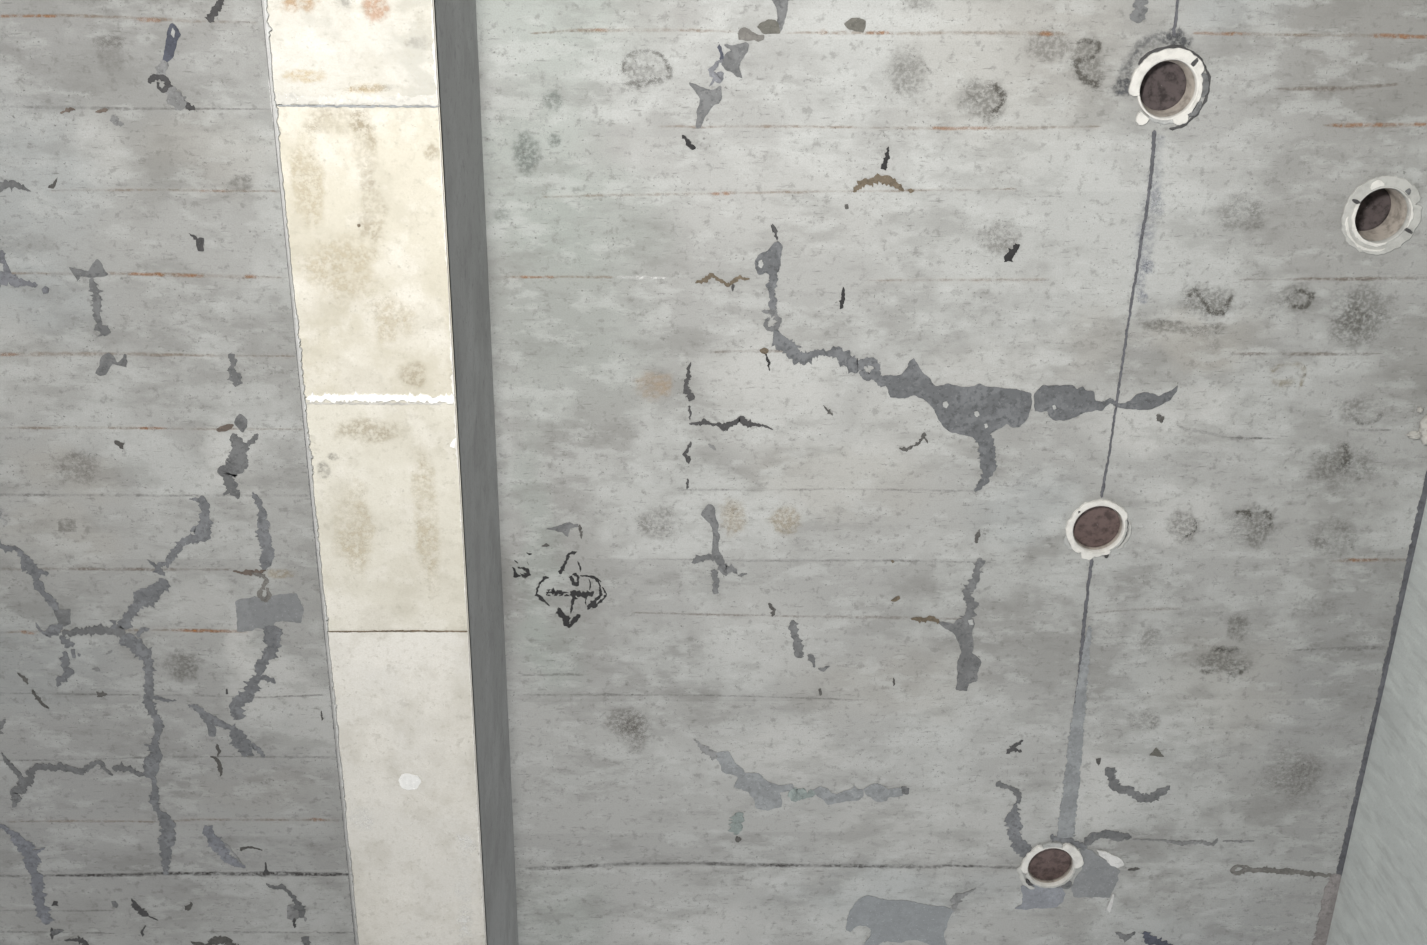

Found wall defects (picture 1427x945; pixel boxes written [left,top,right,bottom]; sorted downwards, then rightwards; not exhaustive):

crack [148,0,224,111]
crack [689,0,788,129]
crack [844,18,866,33]
crack [0,180,31,192]
crack [695,224,1178,492]
crack [682,362,773,594]
crack [0,234,355,945]
crack [911,558,986,691]
crack [1084,471,1427,878]
crack [694,739,909,811]